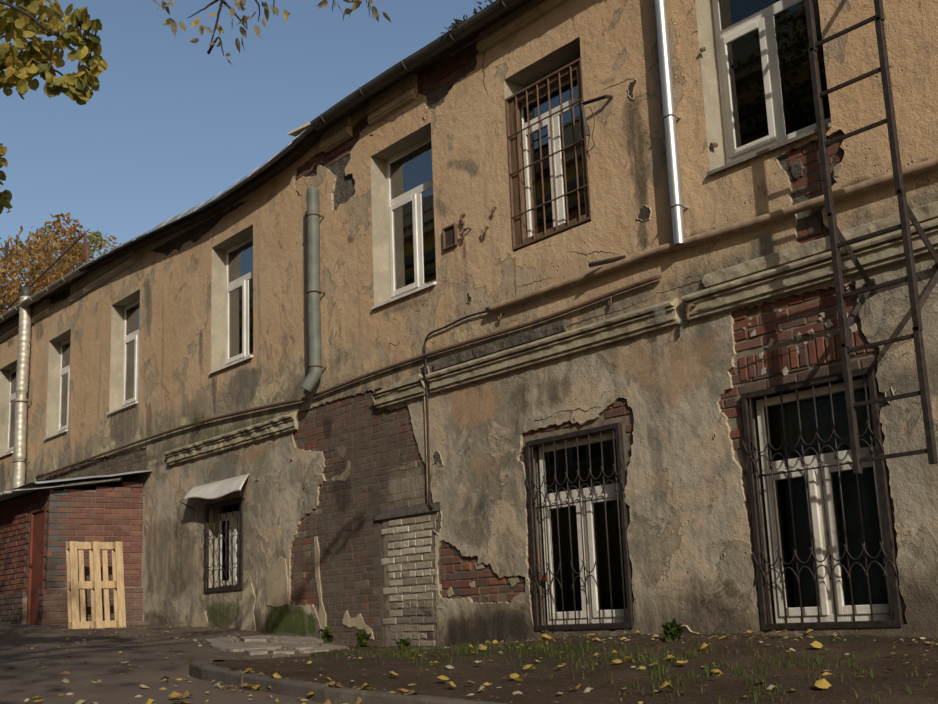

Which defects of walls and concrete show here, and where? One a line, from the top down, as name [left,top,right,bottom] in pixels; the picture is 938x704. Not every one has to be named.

spalling [417,41,477,110]
spalling [293,112,374,211]
damp [626,97,647,247]
spalling [775,129,845,244]
spalling [288,364,634,647]
spalling [717,281,894,633]
spalling [884,452,898,555]